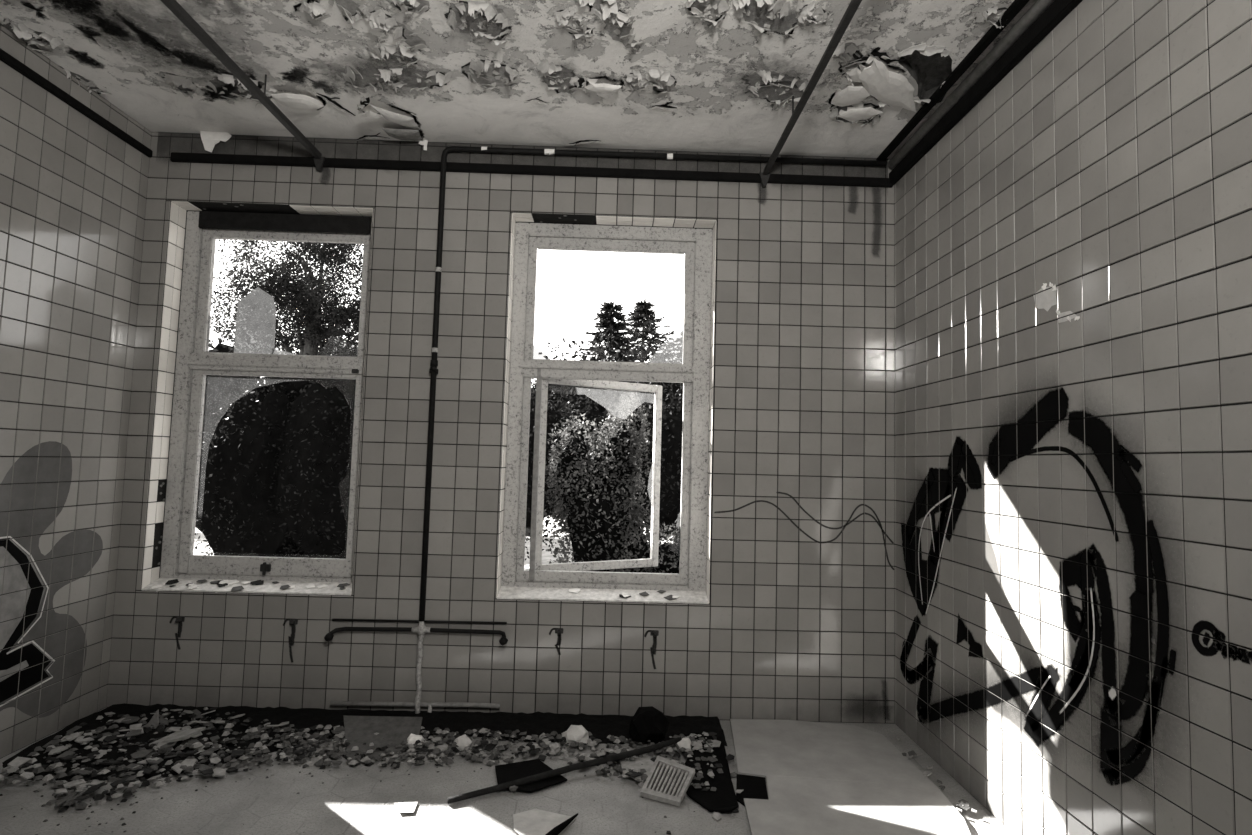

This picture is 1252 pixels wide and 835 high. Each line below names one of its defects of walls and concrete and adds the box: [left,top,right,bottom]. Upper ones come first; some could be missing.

peeling [555,0,645,48]
peeling [684,0,829,35]
peeling [974,6,1014,29]
peeling [0,12,111,95]
peeling [162,72,277,108]
peeling [293,0,520,151]
peeling [536,59,586,96]
peeling [620,66,677,94]
peeling [741,69,809,108]
spalling [828,42,957,127]
peeling [200,131,232,152]
spalling [1033,282,1080,323]